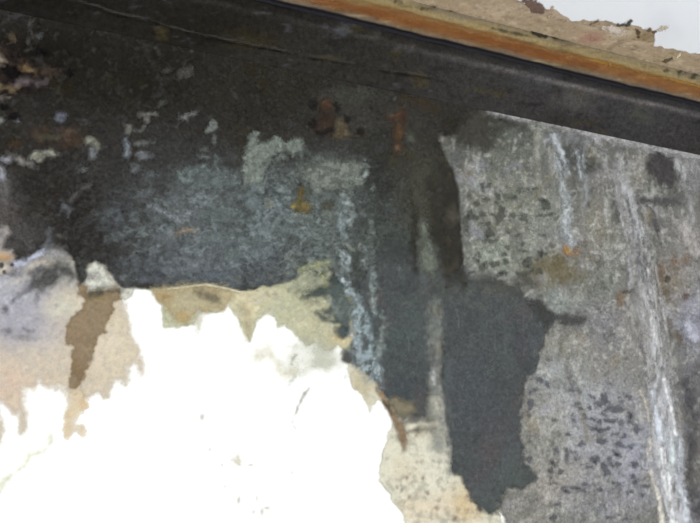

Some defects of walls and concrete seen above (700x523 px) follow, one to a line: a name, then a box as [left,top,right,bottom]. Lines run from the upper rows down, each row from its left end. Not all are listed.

peeling [409,0,700,75]
leakage [535,122,700,245]
peeling [0,226,357,434]
leakage [0,10,559,514]
leakage [561,314,586,325]